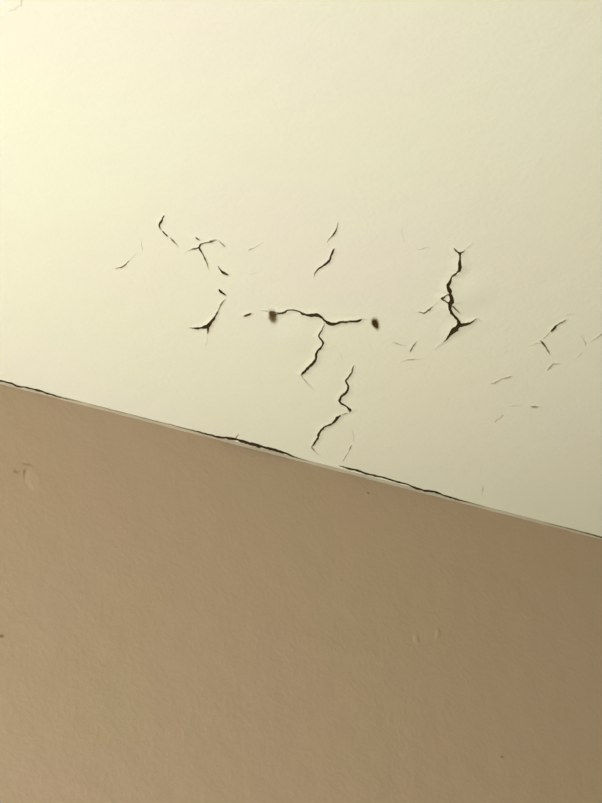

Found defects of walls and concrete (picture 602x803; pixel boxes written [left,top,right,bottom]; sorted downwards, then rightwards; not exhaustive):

crack [113,251,138,270]
crack [155,213,370,391]
crack [391,241,484,363]
crack [0,380,72,400]
crack [174,363,474,504]